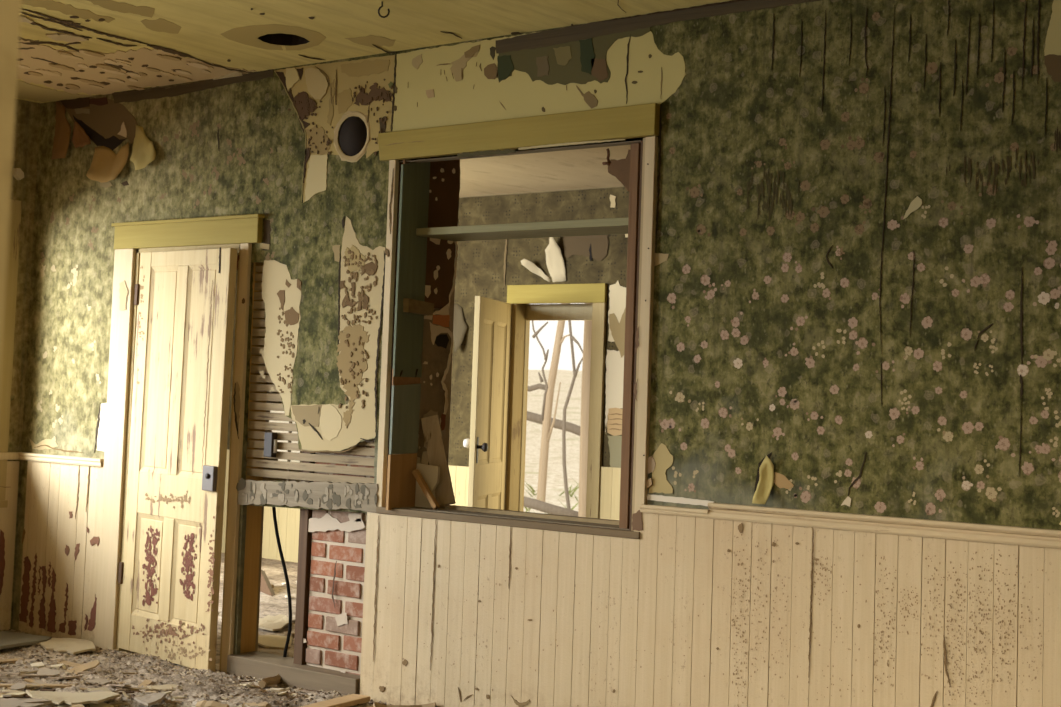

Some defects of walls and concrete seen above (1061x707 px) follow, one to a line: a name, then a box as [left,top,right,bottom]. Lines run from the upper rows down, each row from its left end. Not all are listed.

leakage [18,58,110,89]
leakage [21,0,181,34]
leakage [977,1,1015,120]
flaking render [1044,0,1061,56]
flaking render [274,31,686,203]
leakage [946,148,1039,195]
peeling [260,216,389,451]
spalling [65,527,99,560]
peeling [19,553,97,635]
peeling [132,516,215,672]